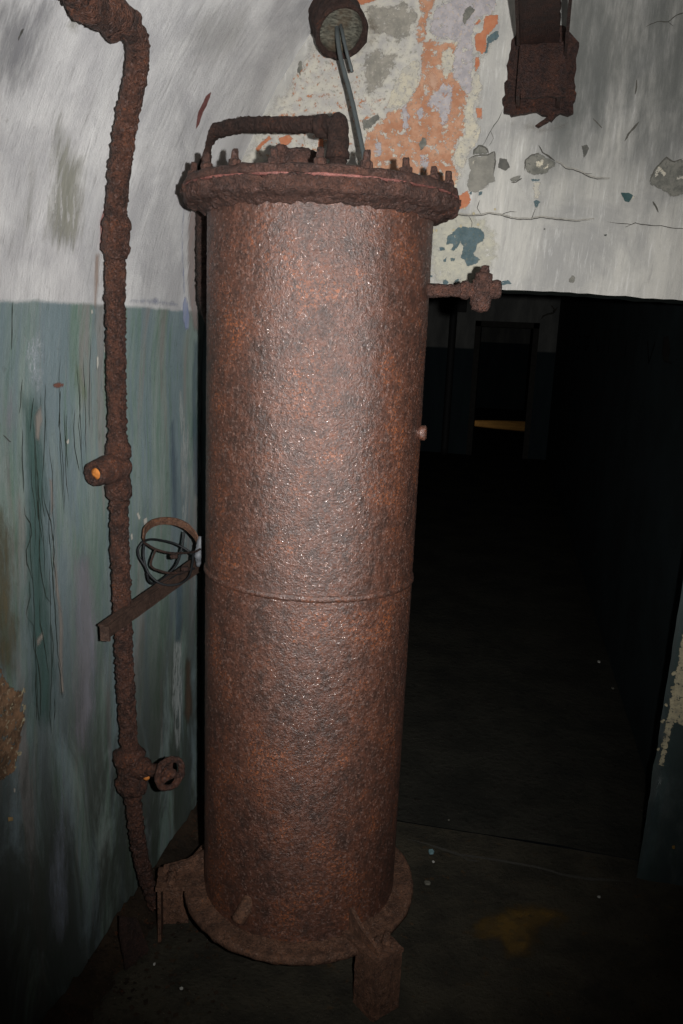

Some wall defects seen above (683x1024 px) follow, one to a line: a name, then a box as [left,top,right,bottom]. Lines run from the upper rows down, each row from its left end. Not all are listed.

peeling [243,133,330,163]
peeling [267,0,555,284]
crack [539,146,610,180]
spalling [650,157,683,196]
crack [458,201,683,229]
peeling [657,635,683,766]
peeling [0,669,26,780]